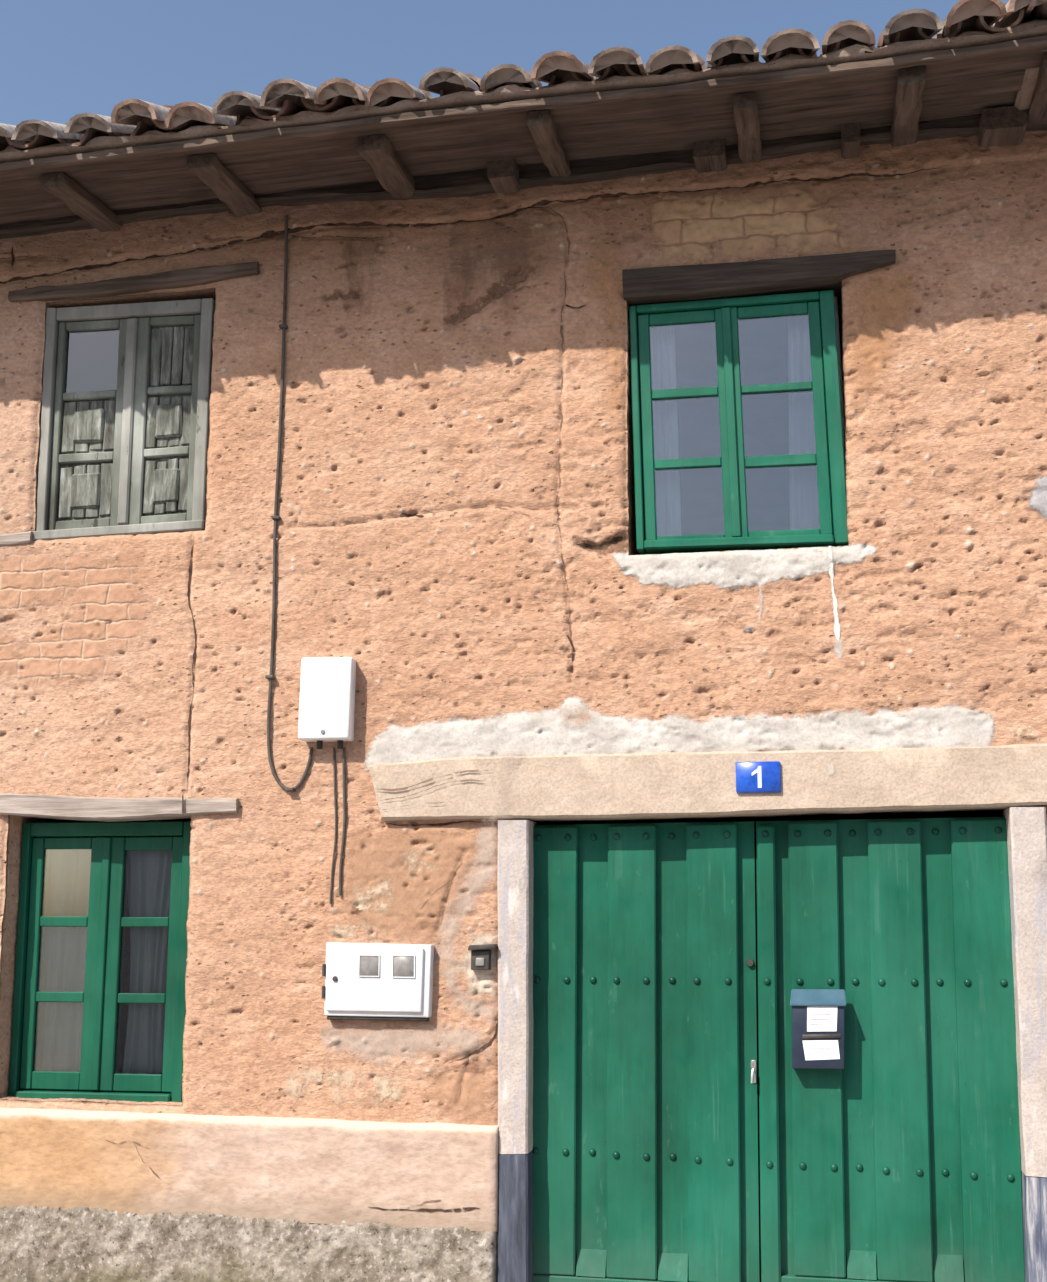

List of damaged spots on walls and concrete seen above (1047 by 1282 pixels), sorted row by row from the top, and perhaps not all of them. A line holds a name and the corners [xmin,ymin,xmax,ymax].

crack [0,159,947,680]
crack [182,538,196,815]
crack [369,1200,480,1212]